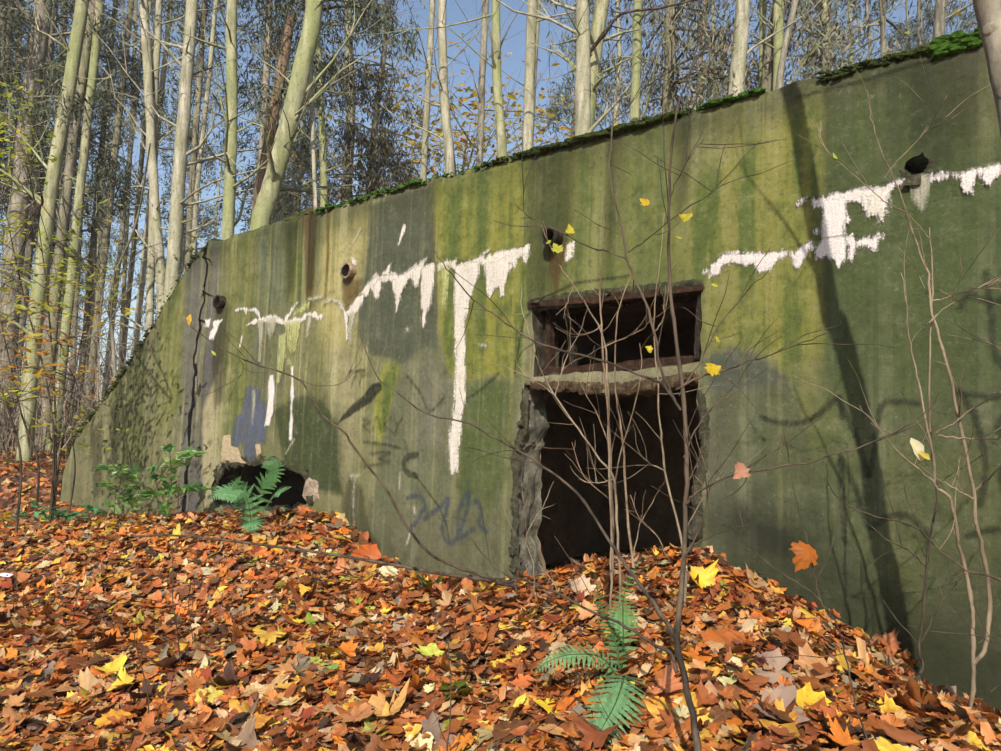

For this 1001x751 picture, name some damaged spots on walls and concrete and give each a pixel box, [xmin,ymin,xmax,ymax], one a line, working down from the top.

water stain [565,241,575,262]
water stain [703,163,1001,278]
crack [181,241,213,513]
spalling [211,435,320,504]
water stain [235,244,530,475]
spalling [508,370,710,580]